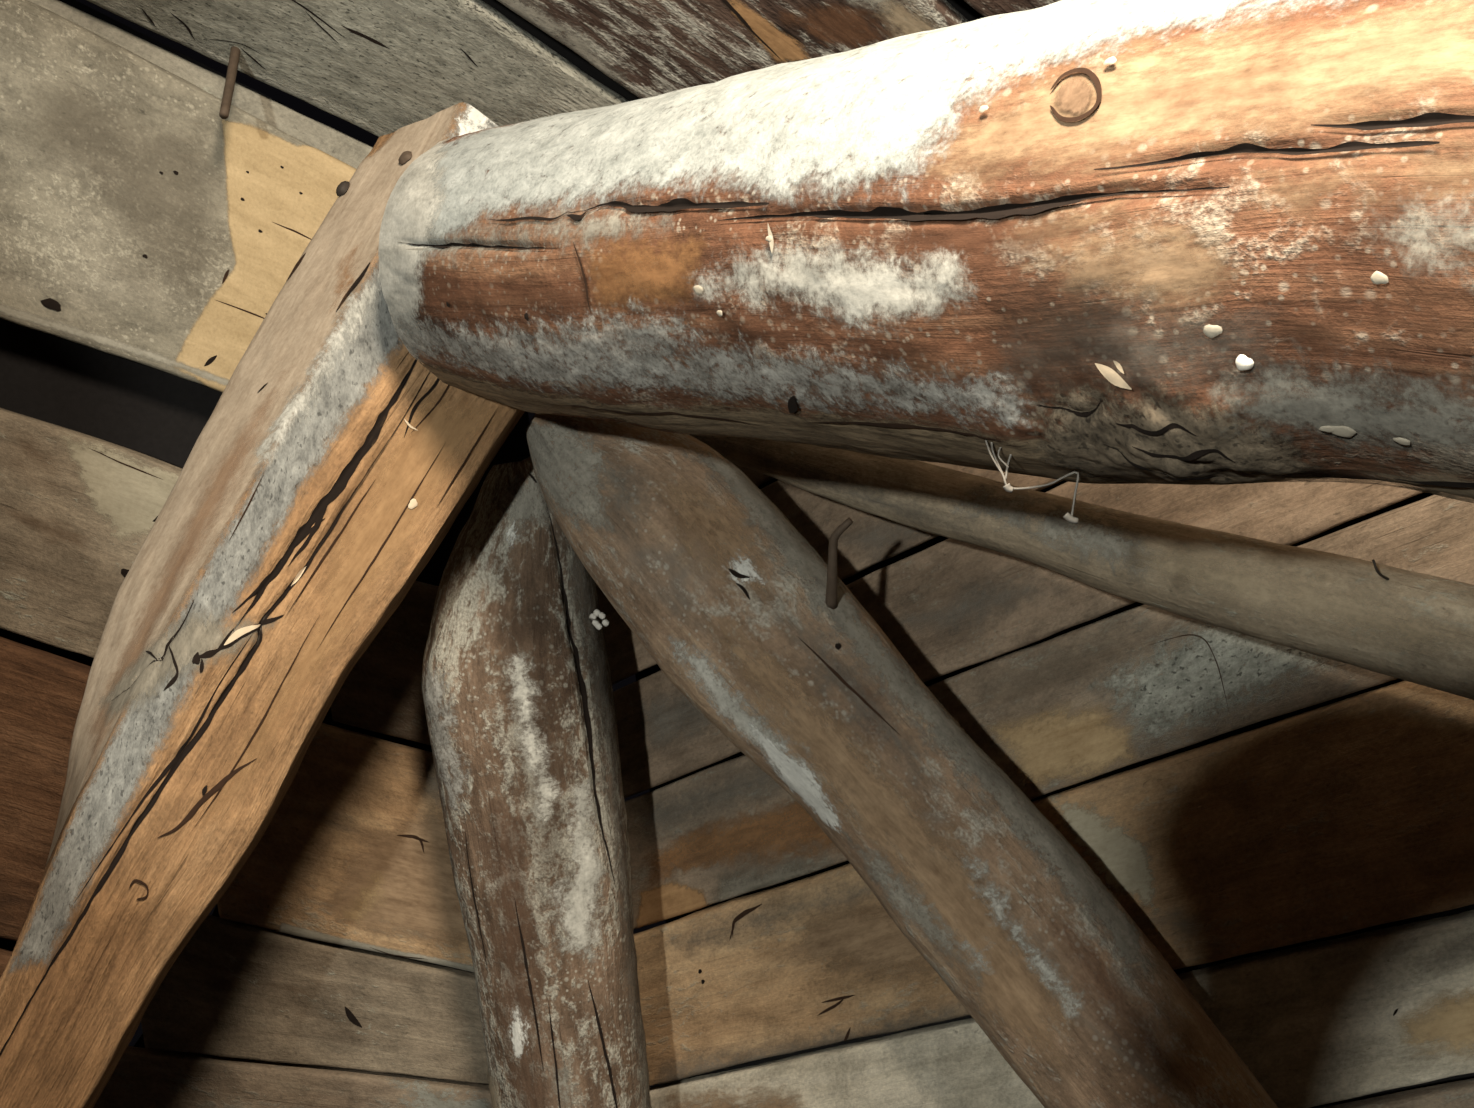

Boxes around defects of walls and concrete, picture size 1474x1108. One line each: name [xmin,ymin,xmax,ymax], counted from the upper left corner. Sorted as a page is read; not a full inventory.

mould [127,0,551,140]
mould [497,0,619,82]
damp [782,0,907,47]
damp [10,262,402,972]
crack [0,358,497,1055]